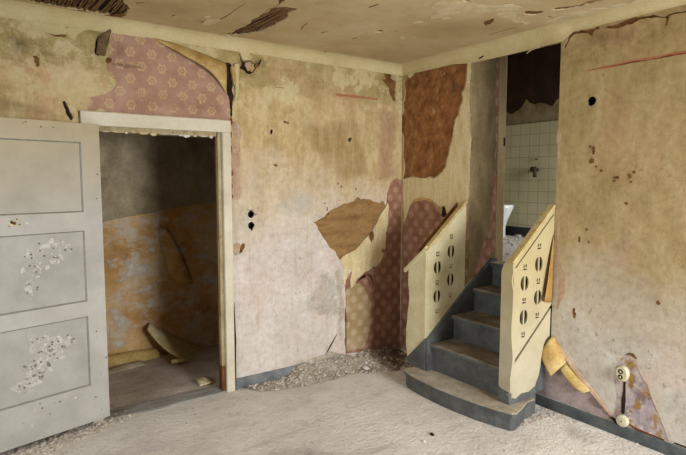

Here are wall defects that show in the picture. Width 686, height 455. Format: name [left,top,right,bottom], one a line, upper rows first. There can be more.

spalling [31,0,130,17]
spalling [221,0,296,37]
spalling [506,43,561,114]
spalling [402,56,484,221]
peeling [19,238,72,300]
spalling [314,188,389,288]
peeling [8,328,79,397]